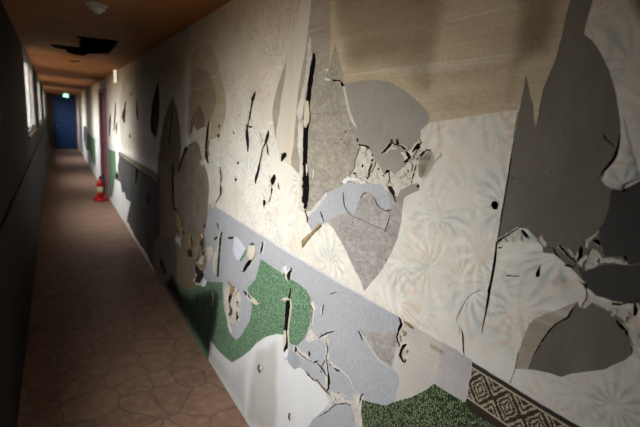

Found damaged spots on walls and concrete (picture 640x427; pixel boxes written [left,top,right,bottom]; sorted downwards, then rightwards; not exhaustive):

crack [244,92,271,185]
peeling [118,44,472,427]
crack [296,33,324,223]
peeling [273,0,640,377]
crack [456,112,529,355]